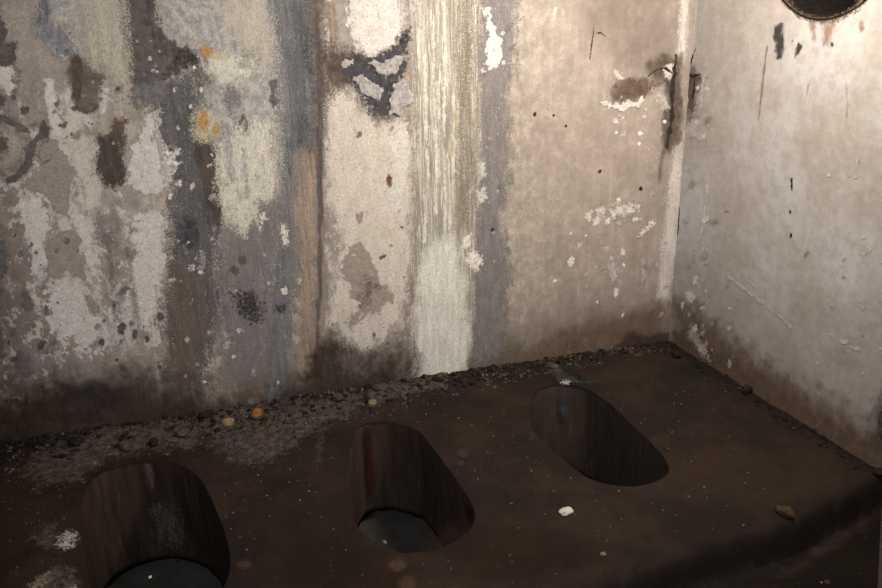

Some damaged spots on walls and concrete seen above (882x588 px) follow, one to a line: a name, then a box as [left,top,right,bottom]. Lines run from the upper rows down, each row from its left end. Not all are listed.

peeling [0,0,195,389]
peeling [187,249,208,275]